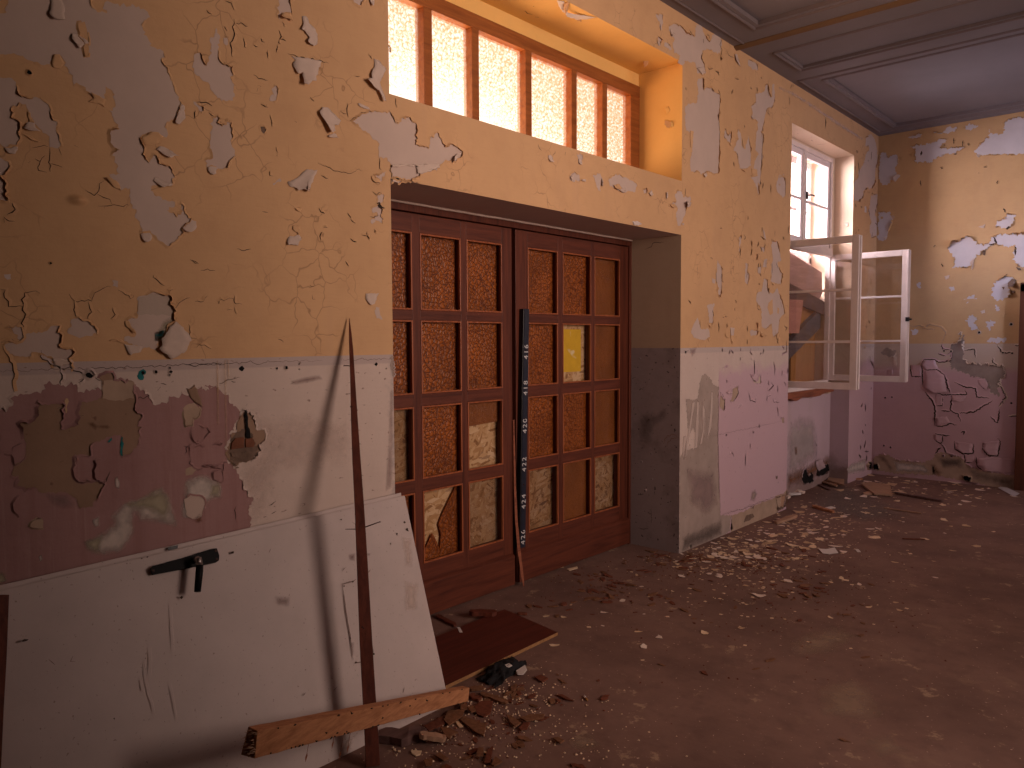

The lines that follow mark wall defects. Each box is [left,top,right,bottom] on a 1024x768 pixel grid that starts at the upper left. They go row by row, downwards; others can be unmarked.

peeling [0,0,237,248]
peeling [275,0,325,85]
crack [319,207,377,266]
peeling [320,59,463,224]
peeling [655,13,775,194]
peeling [853,116,1024,241]
crack [0,286,102,392]
crack [153,260,242,349]
peeling [921,208,1024,404]
hole [225,409,268,469]
peeling [679,374,788,553]
crack [910,344,1019,472]